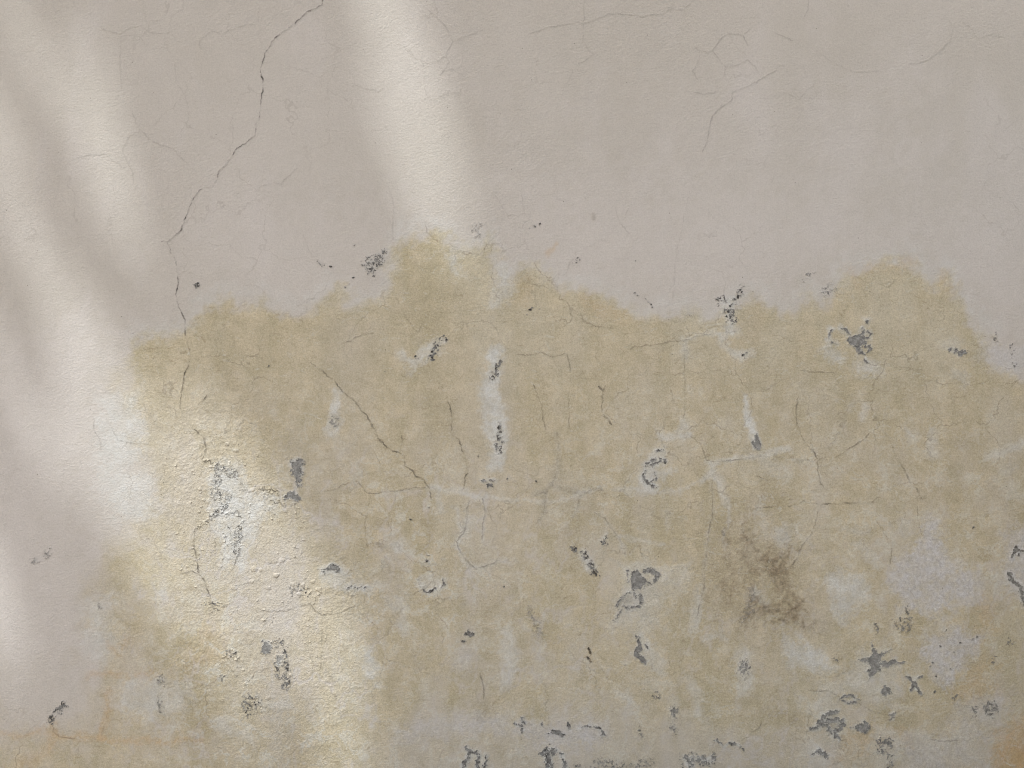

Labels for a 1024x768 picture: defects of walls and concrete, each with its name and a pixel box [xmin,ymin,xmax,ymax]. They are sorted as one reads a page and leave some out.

crack [692,29,793,152]
crack [161,0,324,464]
peeling [344,248,388,289]
spalling [836,312,877,369]
peeling [174,444,308,570]
crack [310,362,432,547]
leakage [0,208,1024,768]
peeling [569,543,601,577]
spalling [256,599,295,691]
spalling [608,561,667,669]
spalling [856,605,937,697]
spalling [804,691,896,768]